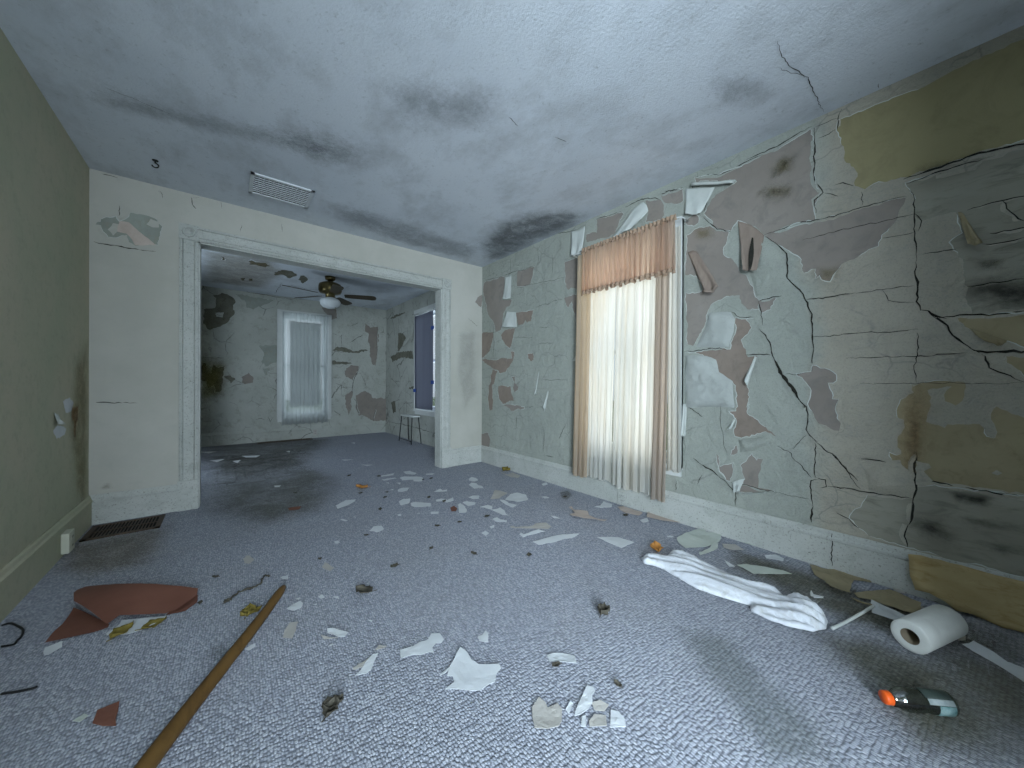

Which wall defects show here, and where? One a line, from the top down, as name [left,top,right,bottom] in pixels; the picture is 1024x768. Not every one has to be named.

crack [600,41,1024,566]